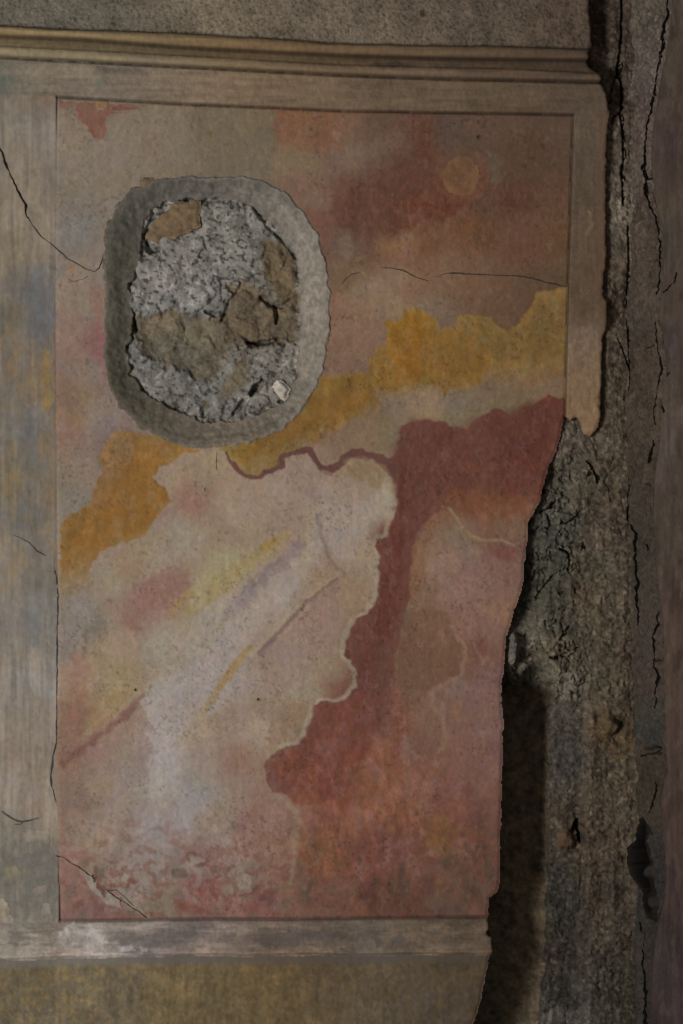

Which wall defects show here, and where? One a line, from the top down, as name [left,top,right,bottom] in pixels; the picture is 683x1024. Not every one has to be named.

crack [0,148,103,282]
spalling [103,176,332,449]
crack [342,267,566,287]
crack [608,0,677,295]
flaking render [473,0,672,1024]
crack [617,322,669,709]
crack [56,855,147,918]
crack [648,782,657,813]